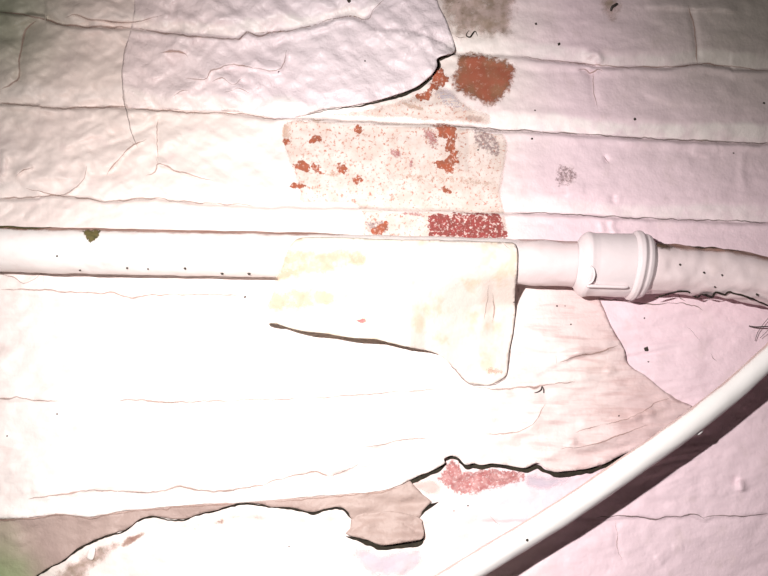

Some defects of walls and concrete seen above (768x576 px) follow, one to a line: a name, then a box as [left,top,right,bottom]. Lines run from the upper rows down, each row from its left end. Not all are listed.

crack [72,46,200,178]
crack [148,109,272,123]
peeling [0,120,692,576]